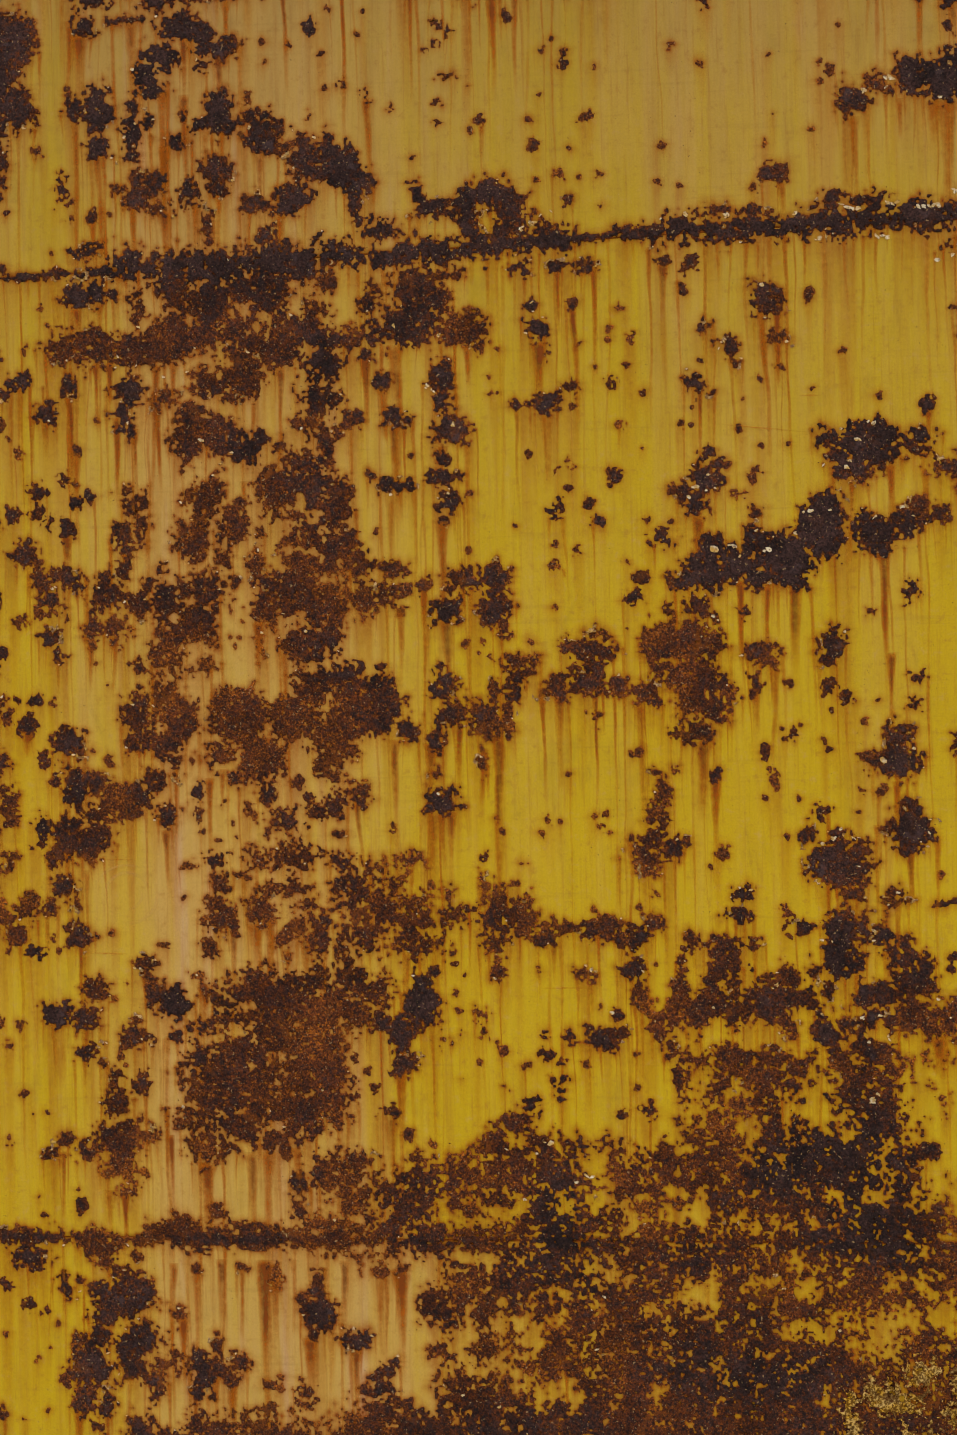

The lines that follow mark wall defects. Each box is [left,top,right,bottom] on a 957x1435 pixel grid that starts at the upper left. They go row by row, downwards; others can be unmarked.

rust [300,15,316,38]
rust [538,35,569,70]
rust [815,0,957,166]
rust [508,285,581,428]
rust [69,488,97,511]
rust [532,394,957,818]
rust [0,692,57,747]
rust [521,1030,571,1103]
rust [379,1102,415,1143]
rust [616,1098,658,1137]
rust [235,1260,295,1353]
peeling [836,1347,957,1435]